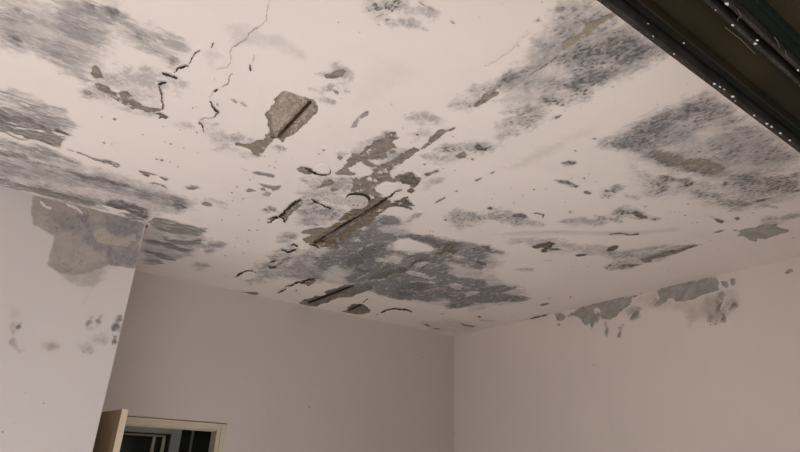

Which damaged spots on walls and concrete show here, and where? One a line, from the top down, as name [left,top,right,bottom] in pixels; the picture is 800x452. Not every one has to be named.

mould [0,91,224,265]
peeling [90,66,168,119]
crack [158,6,268,132]
spalling [235,91,318,156]
spalling [267,199,303,223]
mould [368,0,401,25]
peeling [297,128,473,249]
mould [543,8,650,95]
mould [611,99,799,211]
spalling [299,243,459,314]
damp [286,215,529,308]
peeling [531,295,640,329]